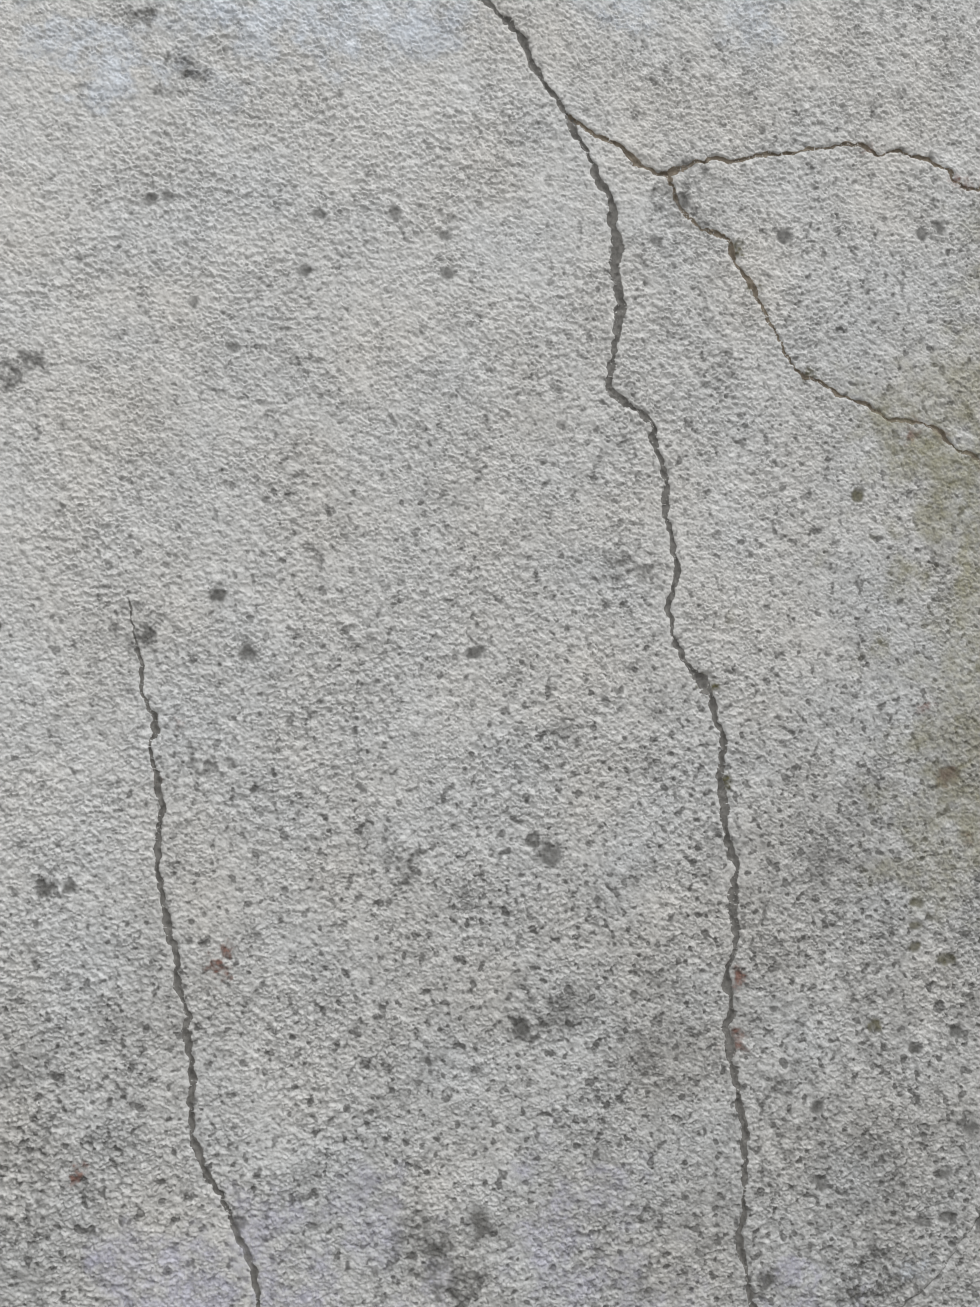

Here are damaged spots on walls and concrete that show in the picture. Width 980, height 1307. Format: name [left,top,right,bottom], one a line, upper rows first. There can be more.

crack [128,600,261,1307]
crack [478,0,980,1307]